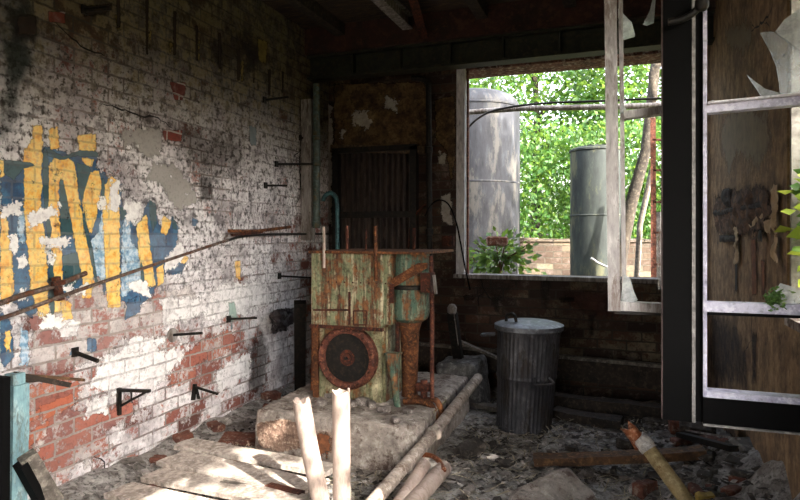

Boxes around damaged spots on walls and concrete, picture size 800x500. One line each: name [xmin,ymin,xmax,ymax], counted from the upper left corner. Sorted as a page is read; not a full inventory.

crack [103,104,172,129]
spalling [163,130,183,142]
peeling [0,198,71,269]
peeling [97,179,143,226]
peeling [146,162,200,210]
flaking render [713,183,778,266]
peeling [164,242,187,273]
peeling [28,276,237,485]
spalling [218,419,300,452]